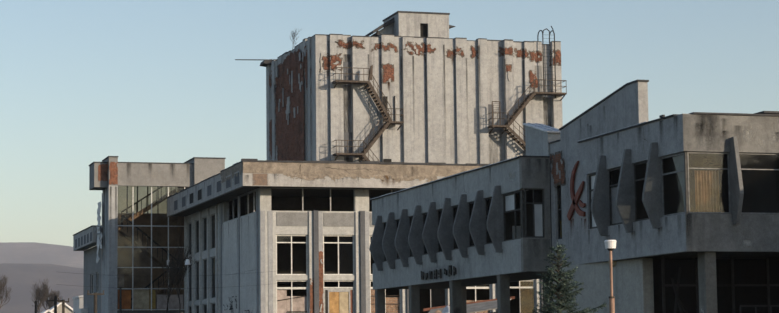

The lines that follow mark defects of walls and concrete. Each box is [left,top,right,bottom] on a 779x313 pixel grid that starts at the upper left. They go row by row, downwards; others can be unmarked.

spalling [445,45,480,59]
spalling [498,46,561,89]
spalling [269,39,436,161]
spalling [98,162,118,185]
spalling [550,151,566,188]